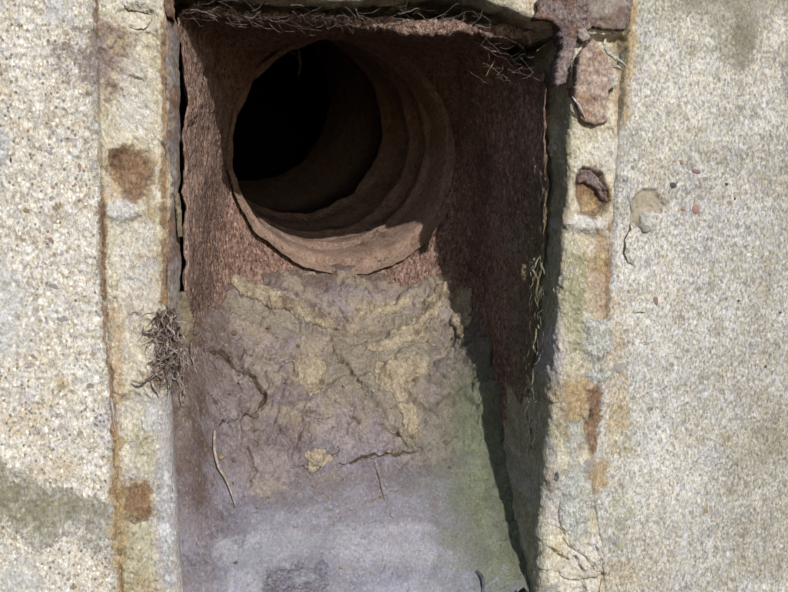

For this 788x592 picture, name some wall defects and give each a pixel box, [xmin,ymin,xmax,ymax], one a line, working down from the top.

corrosion [105,0,177,228]
corrosion [569,0,634,135]
spalling [631,189,663,228]
corrosion [151,238,182,389]
corrosion [96,203,153,592]
corrosion [566,380,609,495]
crack [558,502,602,592]